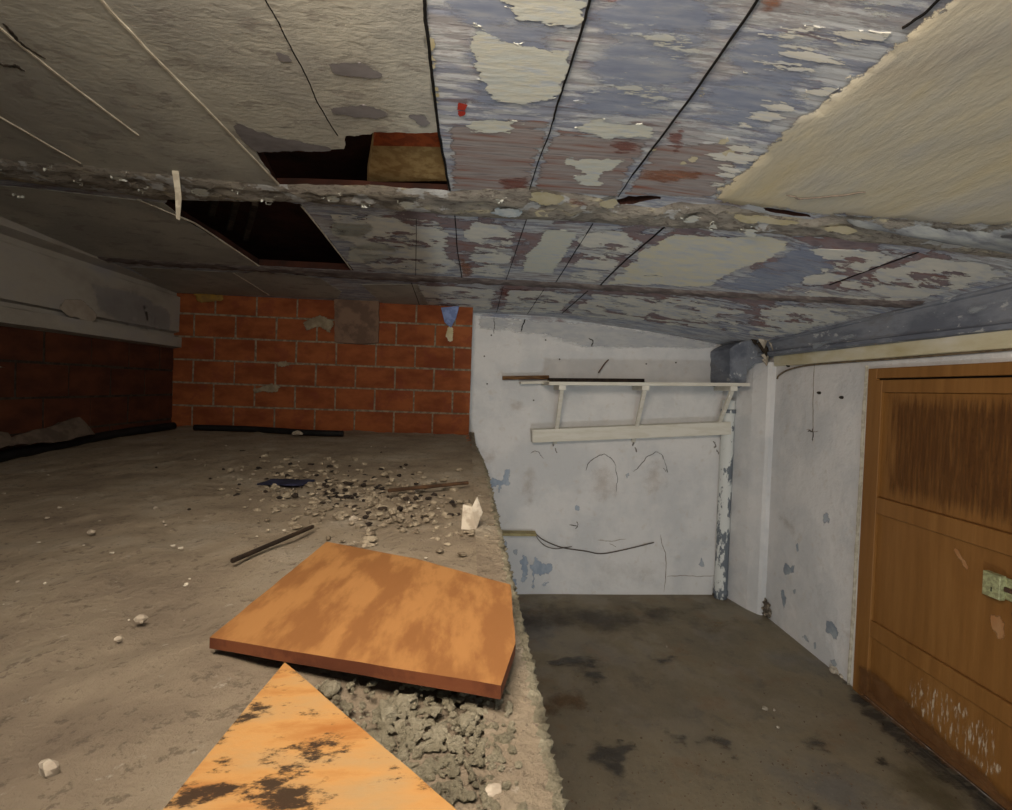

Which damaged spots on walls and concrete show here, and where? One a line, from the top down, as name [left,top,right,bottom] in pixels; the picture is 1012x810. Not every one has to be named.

peeling [234,123,331,153]
peeling [326,0,1012,366]
spalling [470,432,570,810]